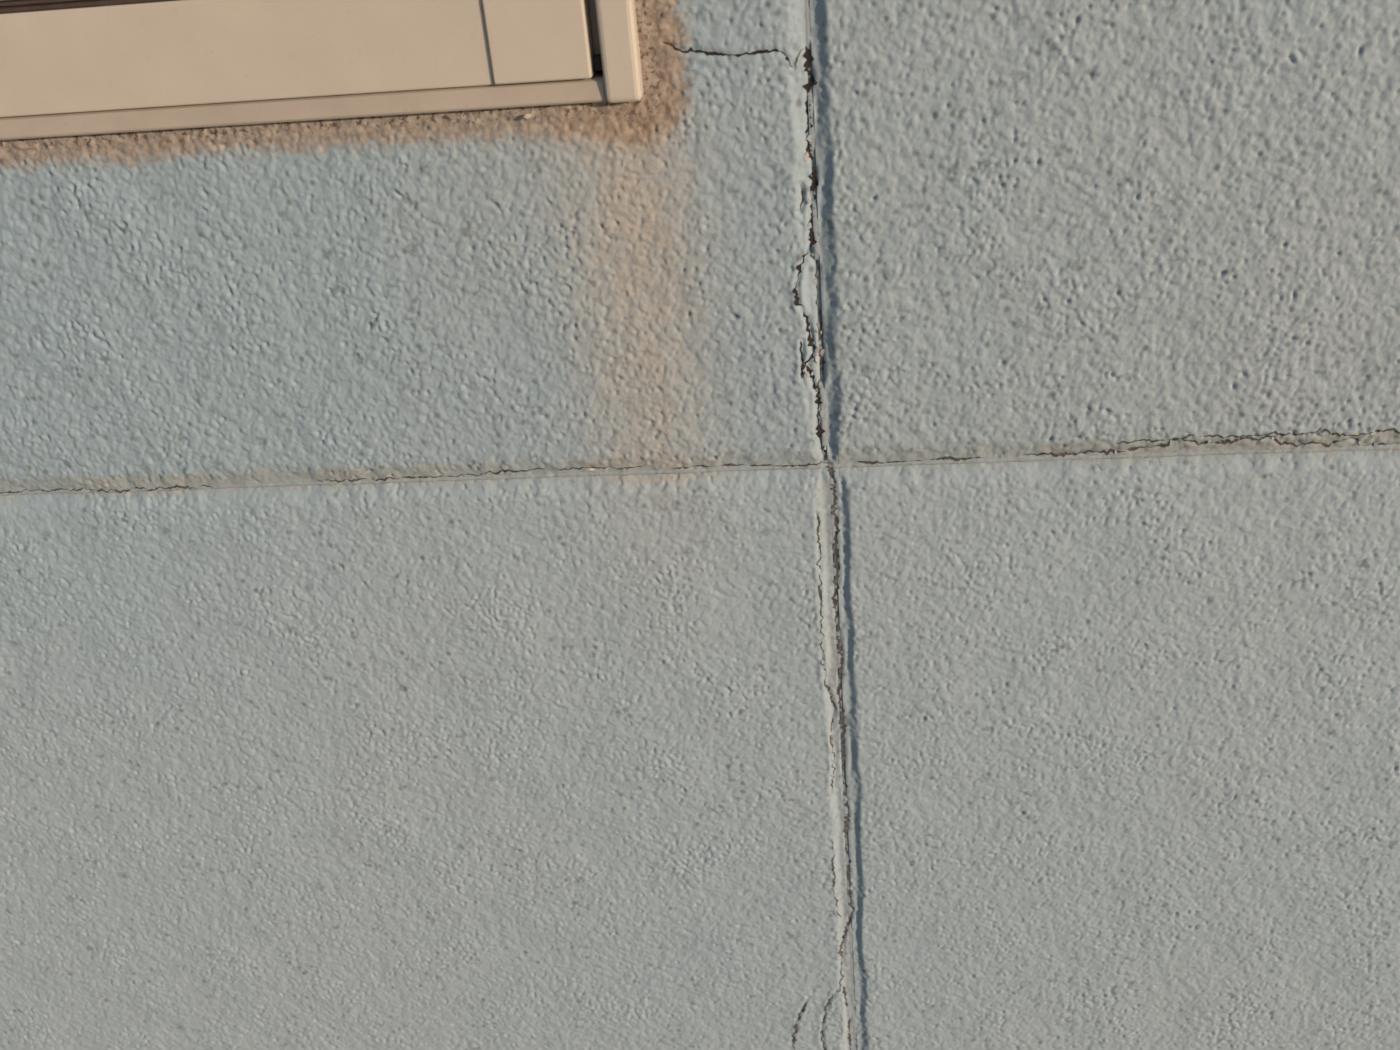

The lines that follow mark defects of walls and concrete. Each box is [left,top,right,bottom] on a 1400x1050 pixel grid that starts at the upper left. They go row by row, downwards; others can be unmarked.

crack [319,42,981,1050]
crack [1026,428,1400,457]